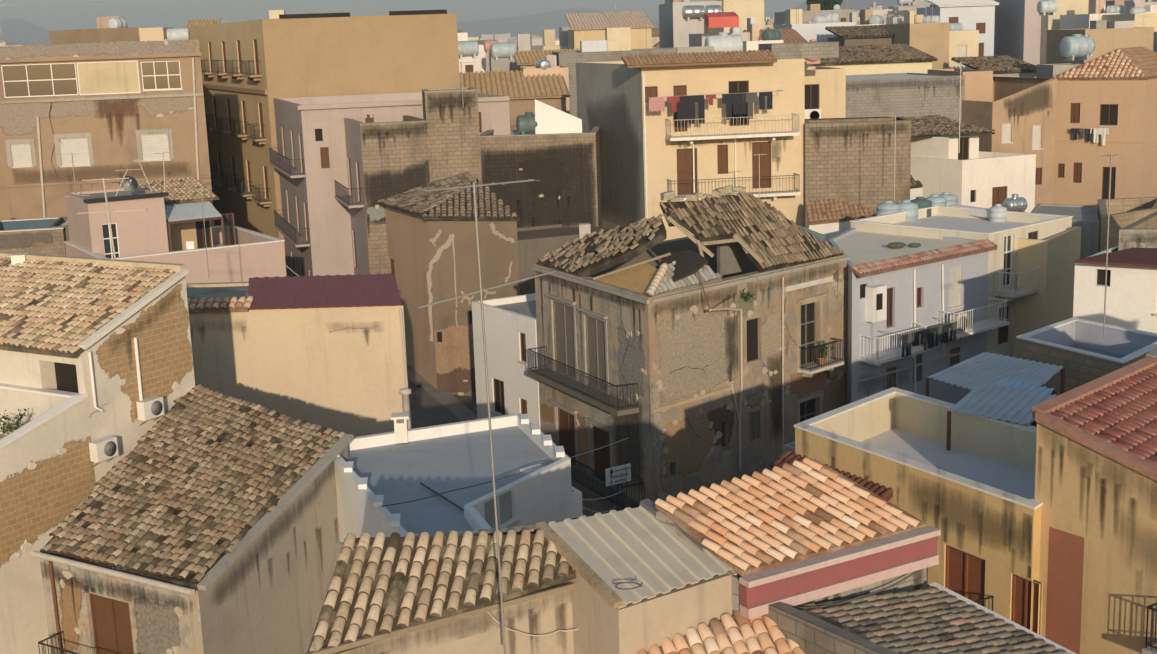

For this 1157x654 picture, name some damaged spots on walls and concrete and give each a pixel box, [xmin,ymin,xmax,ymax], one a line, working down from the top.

peeling [96,284,193,423]
peeling [617,292,847,501]
peeling [0,437,96,568]